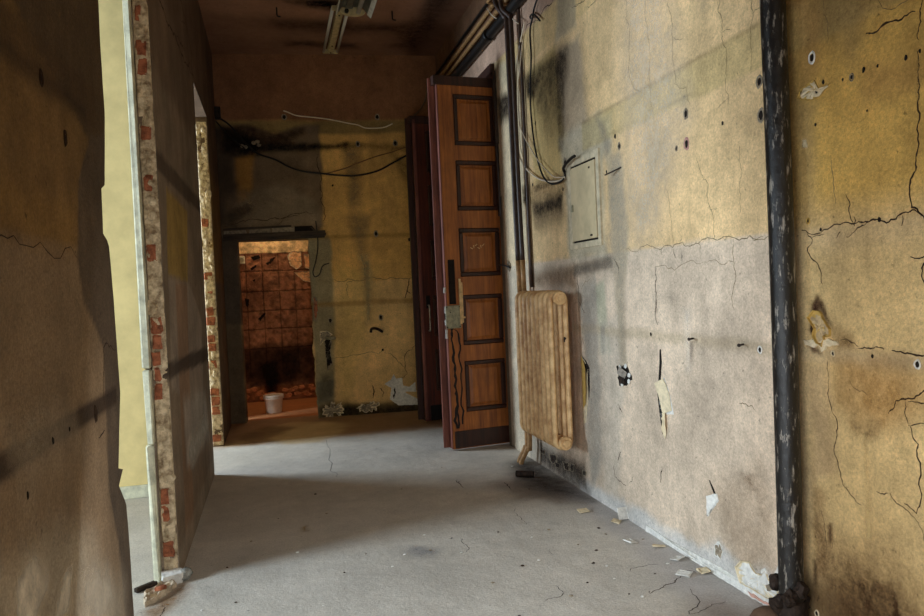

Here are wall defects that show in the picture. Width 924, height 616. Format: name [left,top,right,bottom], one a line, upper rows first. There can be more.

crack [716,3,757,110]
crack [802,0,924,283]
flaking render [287,250,310,282]
crack [615,164,768,323]
peeling [385,374,418,405]
spalling [616,364,632,387]
flaking render [803,310,839,357]
crack [841,339,924,357]
crack [827,362,924,540]
flaking render [645,525,778,606]